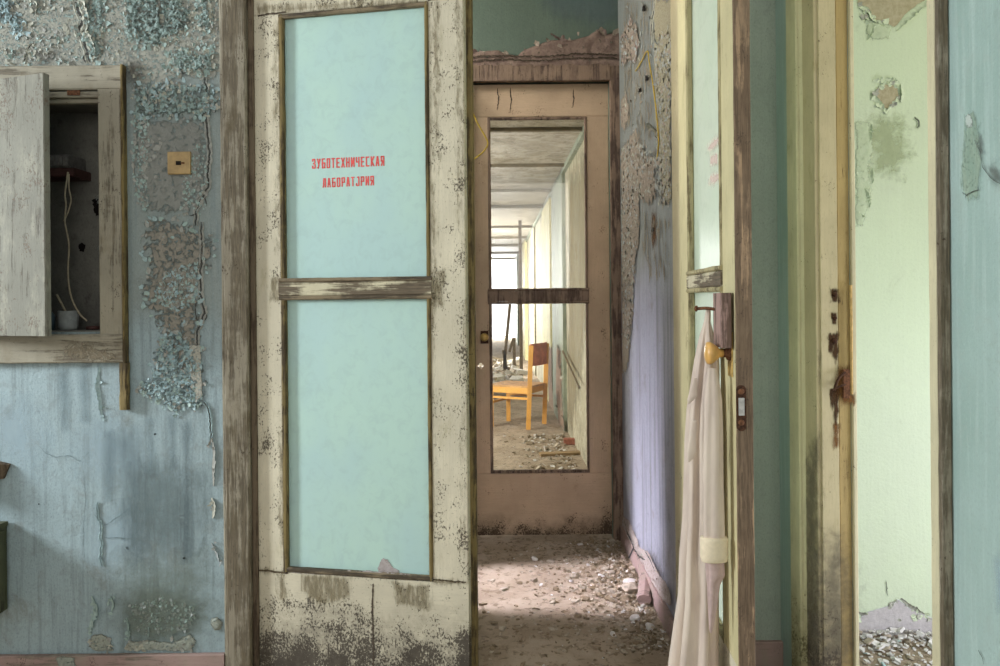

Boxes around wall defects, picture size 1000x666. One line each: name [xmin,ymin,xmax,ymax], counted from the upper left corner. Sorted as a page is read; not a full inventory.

peeling [0,0,220,93]
flaking render [857,0,927,40]
flaking render [871,76,905,114]
crack [189,77,213,345]
peeling [620,0,672,376]
peeling [855,121,875,225]
peeling [962,112,981,198]
peeling [128,114,219,409]
corrosion [828,289,855,447]
flaking render [87,618,196,654]
flaking render [859,598,932,635]